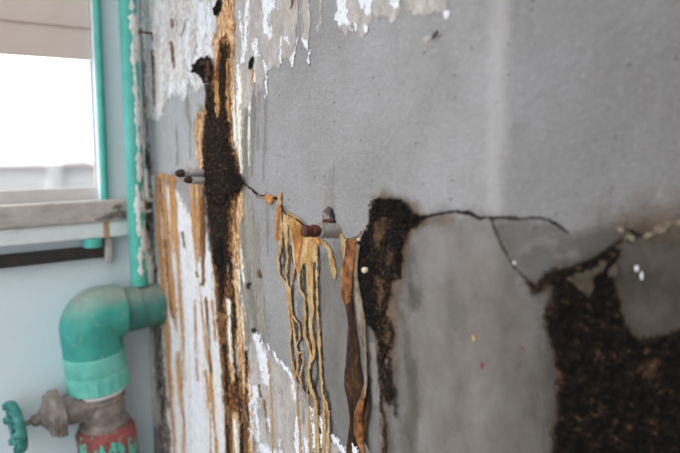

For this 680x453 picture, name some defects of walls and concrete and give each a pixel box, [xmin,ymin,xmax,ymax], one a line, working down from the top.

damp [235,63,251,174]
peeling [233,0,326,126]
peeling [334,0,450,39]
crack [244,182,304,225]
crack [419,209,569,283]
rust [155,173,186,453]
damp [300,197,680,453]
peeling [247,332,346,453]